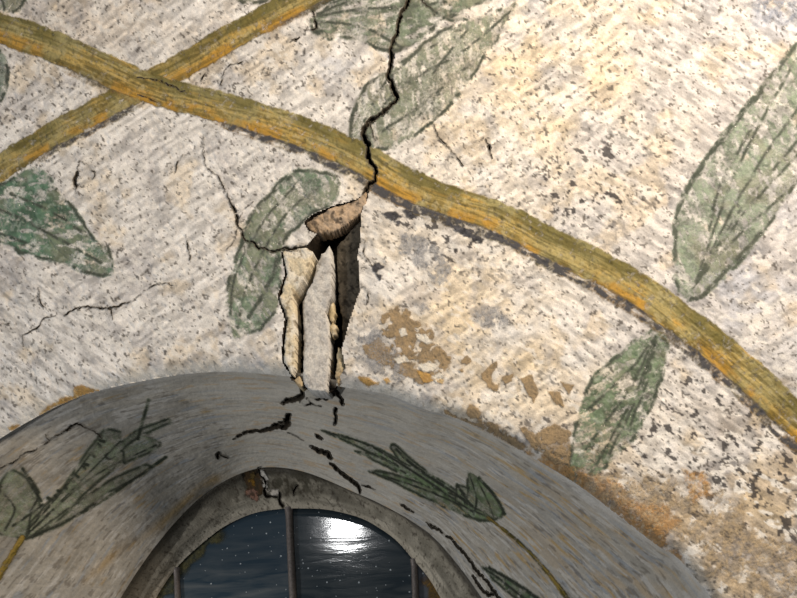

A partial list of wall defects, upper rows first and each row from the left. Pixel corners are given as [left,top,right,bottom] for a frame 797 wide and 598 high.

crack [290,10,318,42]
crack [361,0,435,199]
crack [433,124,464,166]
crack [202,137,307,253]
spalling [278,192,369,400]
peeling [362,306,471,385]
peeling [481,362,538,403]
peeling [548,381,574,407]
crack [216,389,373,494]
crack [257,467,298,508]
crack [400,504,501,598]